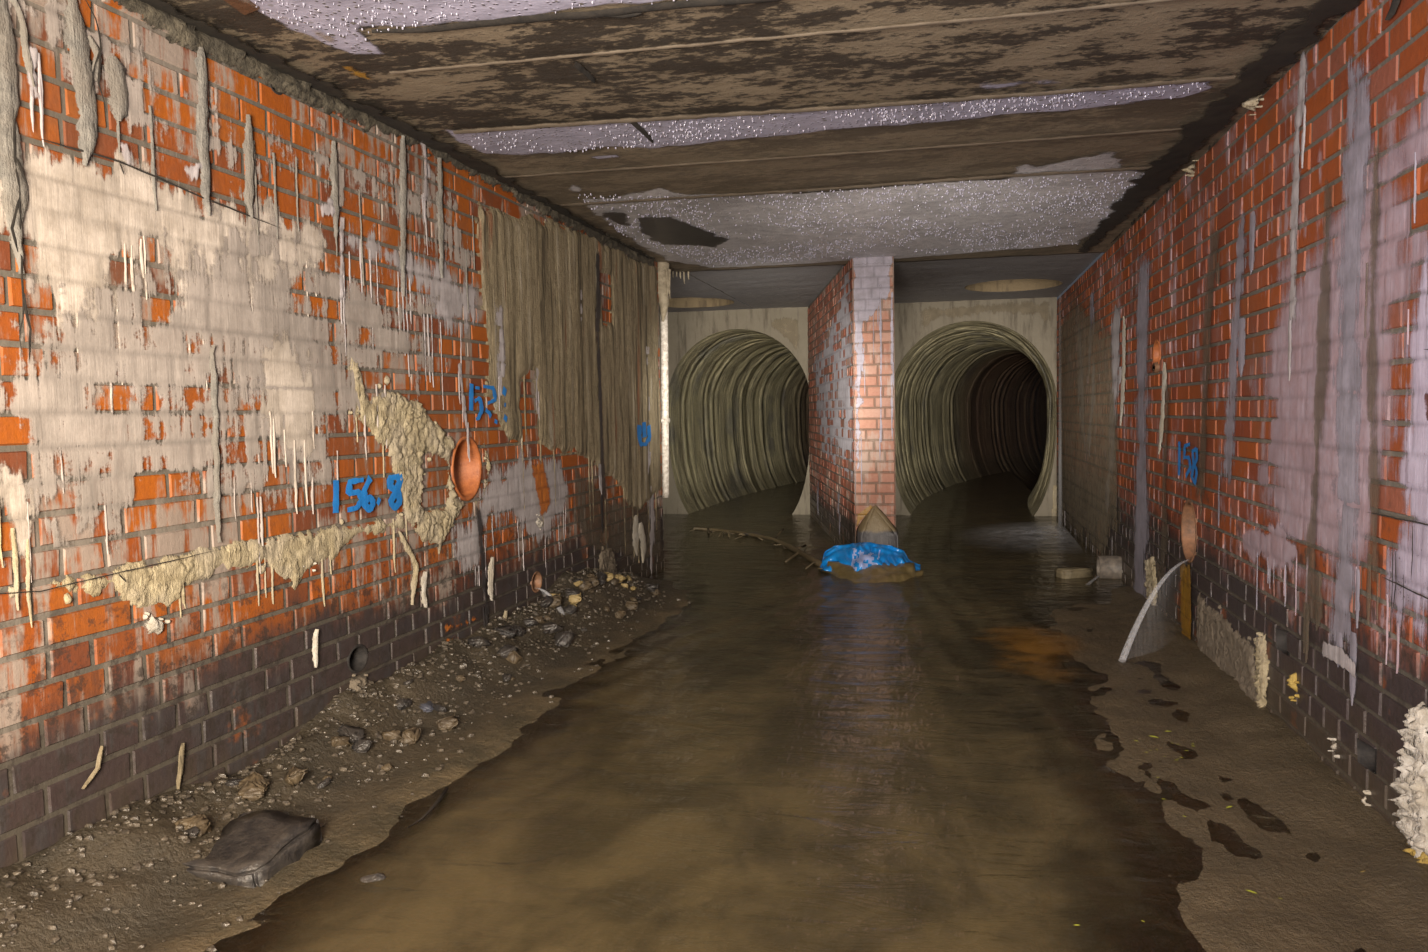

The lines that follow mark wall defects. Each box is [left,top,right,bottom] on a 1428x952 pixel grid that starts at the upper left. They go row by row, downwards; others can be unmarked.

leakage [0,0,655,635]
spalling [602,212,728,247]
leakage [813,263,894,535]
leakage [921,251,1191,640]
leakage [1078,0,1428,708]
leakage [1361,701,1428,864]